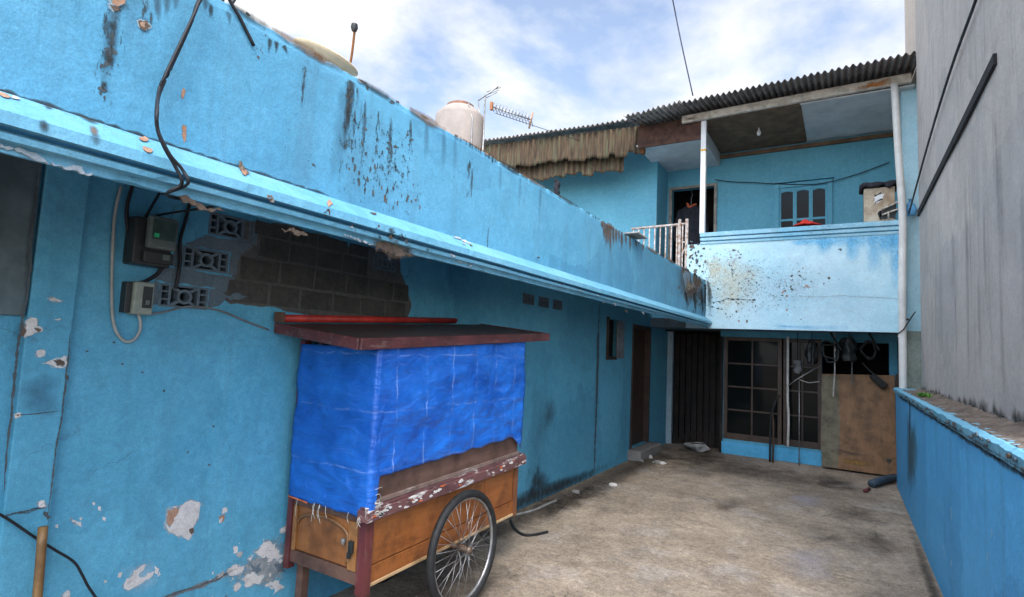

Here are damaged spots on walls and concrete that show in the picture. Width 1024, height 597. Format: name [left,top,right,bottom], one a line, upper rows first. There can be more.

spalling [0,143,94,176]
spalling [179,195,224,213]
spalling [281,227,308,236]
rust [601,221,644,249]
peeling [19,316,44,338]
crack [4,168,70,519]
peeling [34,349,69,368]
leakage [479,454,668,536]
peeling [163,499,205,541]
peeling [164,525,286,597]
peeling [104,564,161,592]